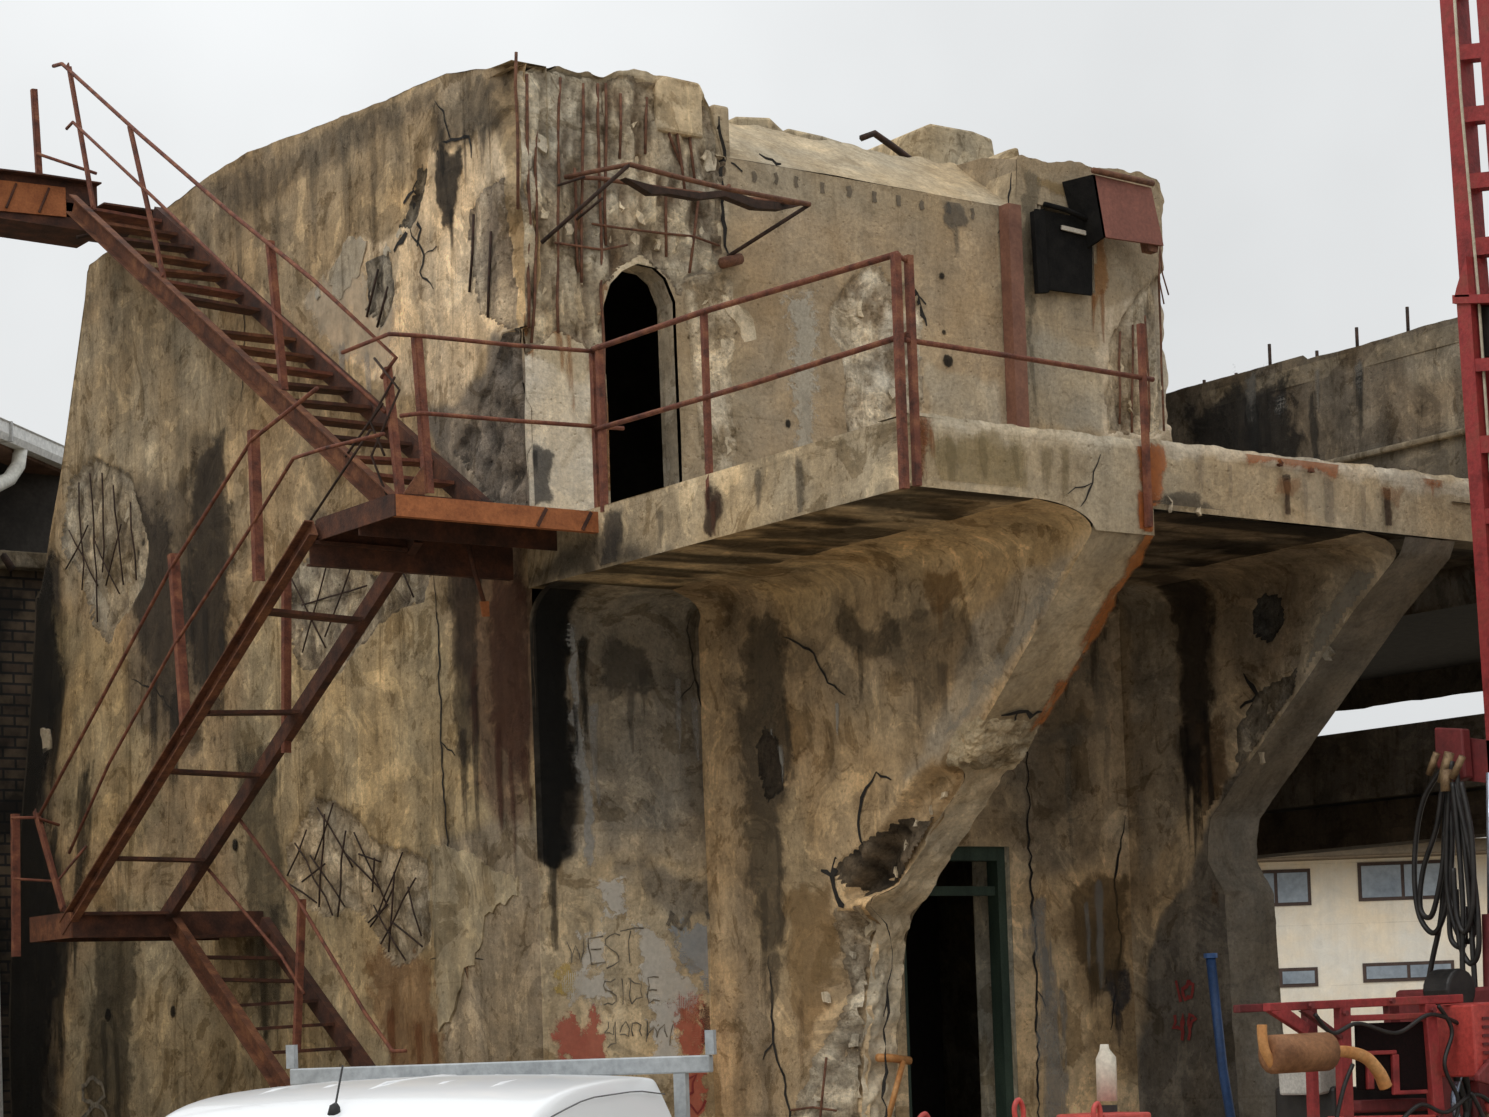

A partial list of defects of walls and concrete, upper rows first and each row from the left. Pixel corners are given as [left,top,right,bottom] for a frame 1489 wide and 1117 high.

leakage [435,143,463,246]
spalling [453,52,756,506]
spalling [61,457,149,644]
spalling [286,797,519,1032]
leakage [536,588,654,946]
leakage [738,614,794,1002]
spalling [790,791,948,1117]
crack [1001,710,1043,1117]
corrosion [1032,442,1167,730]
leakage [1156,579,1216,846]
corrosion [1246,454,1338,515]
corrosion [1383,487,1392,526]